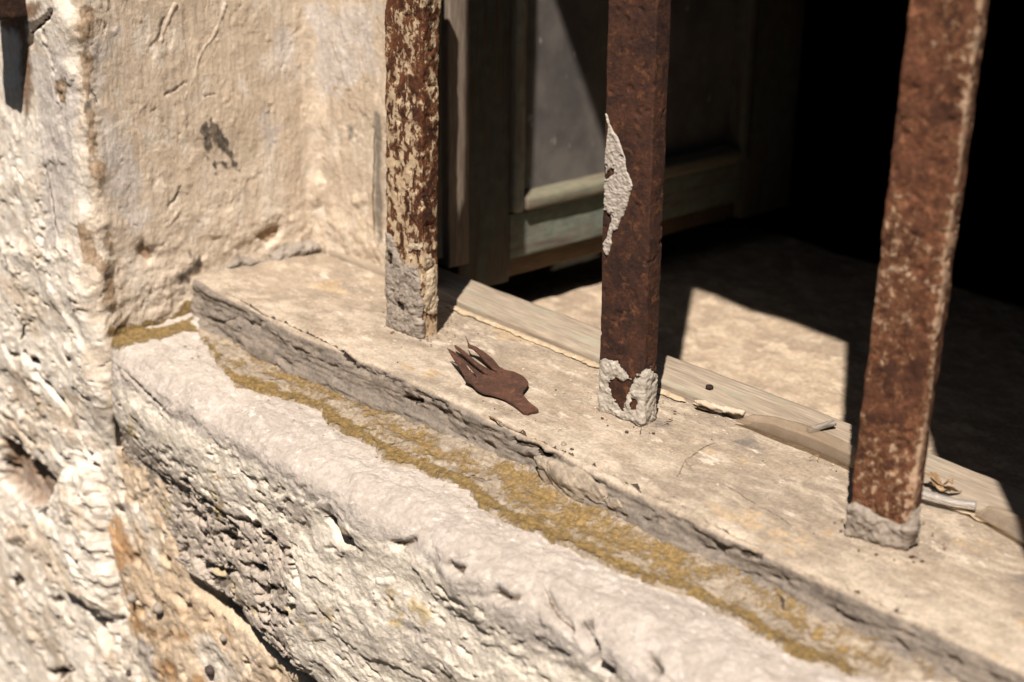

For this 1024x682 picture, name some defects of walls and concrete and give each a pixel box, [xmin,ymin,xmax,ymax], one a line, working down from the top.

damp [200,117,240,174]
peeling [603,114,633,255]